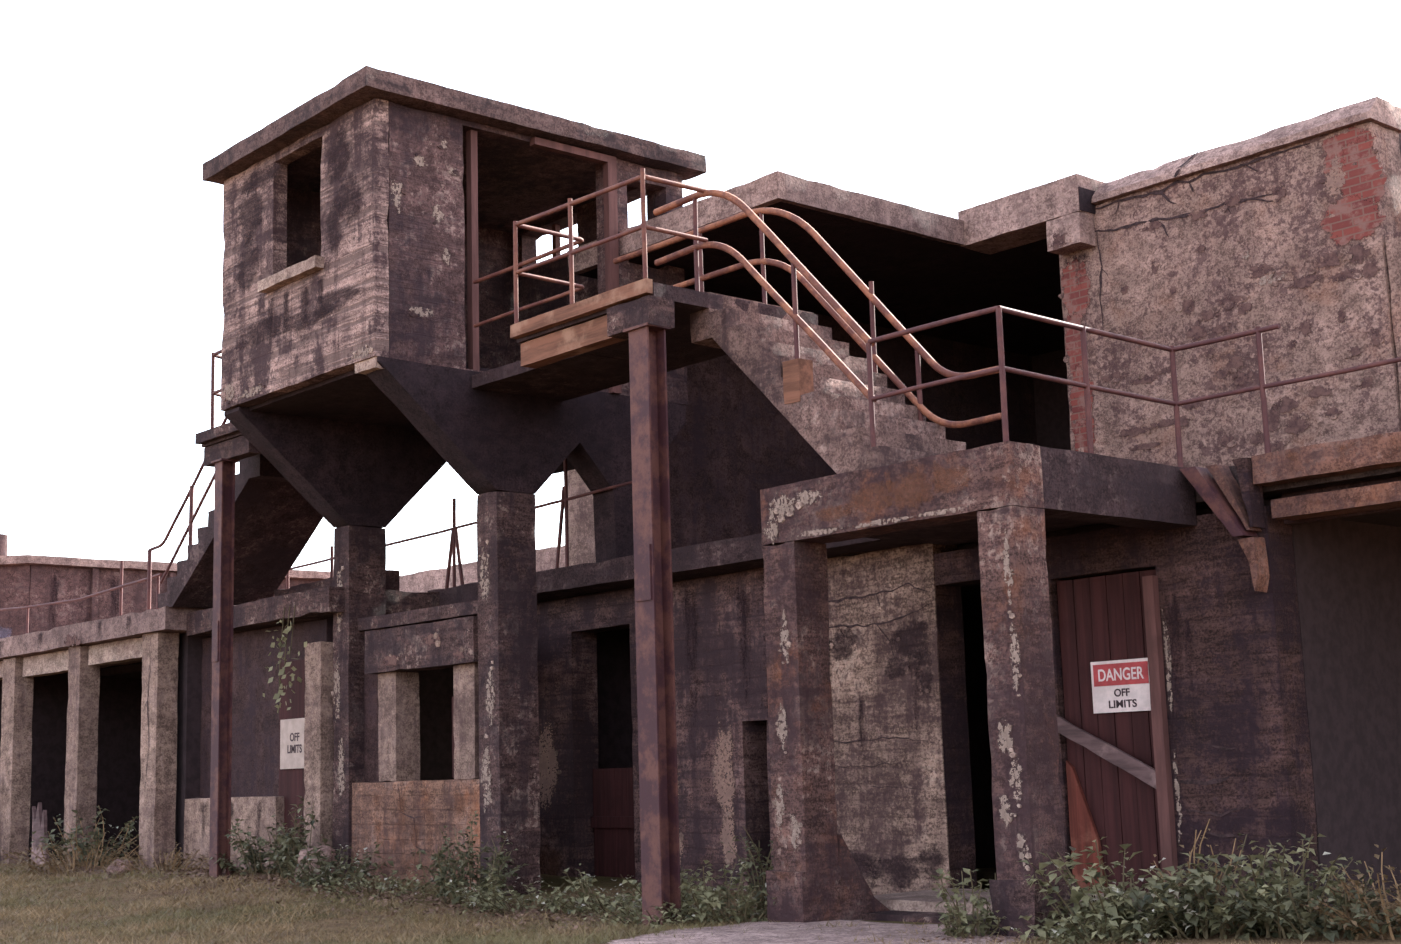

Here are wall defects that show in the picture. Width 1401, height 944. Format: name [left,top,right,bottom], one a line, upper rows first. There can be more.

leakage [235,164,280,289]
leakage [236,279,360,349]
leakage [326,130,360,250]
flaking render [1051,233,1171,453]
crack [1095,143,1310,328]
flaking render [1170,127,1388,385]
spalling [1119,396,1203,451]
peeling [1003,531,1022,696]
peeling [997,720,1032,871]